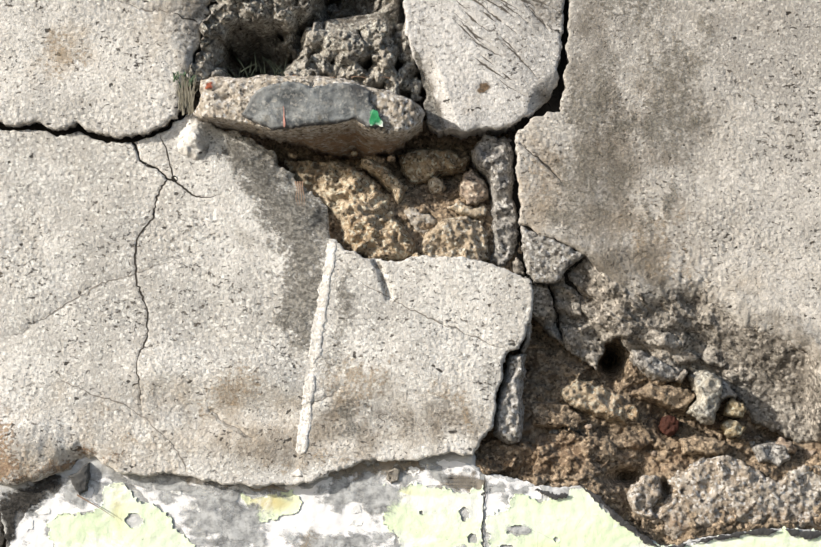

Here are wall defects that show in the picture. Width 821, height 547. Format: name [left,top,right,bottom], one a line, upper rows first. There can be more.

crack [0,110,220,474]
spalling [186,0,426,109]
spalling [9,118,821,547]
crack [509,0,584,342]
leakage [546,0,709,237]